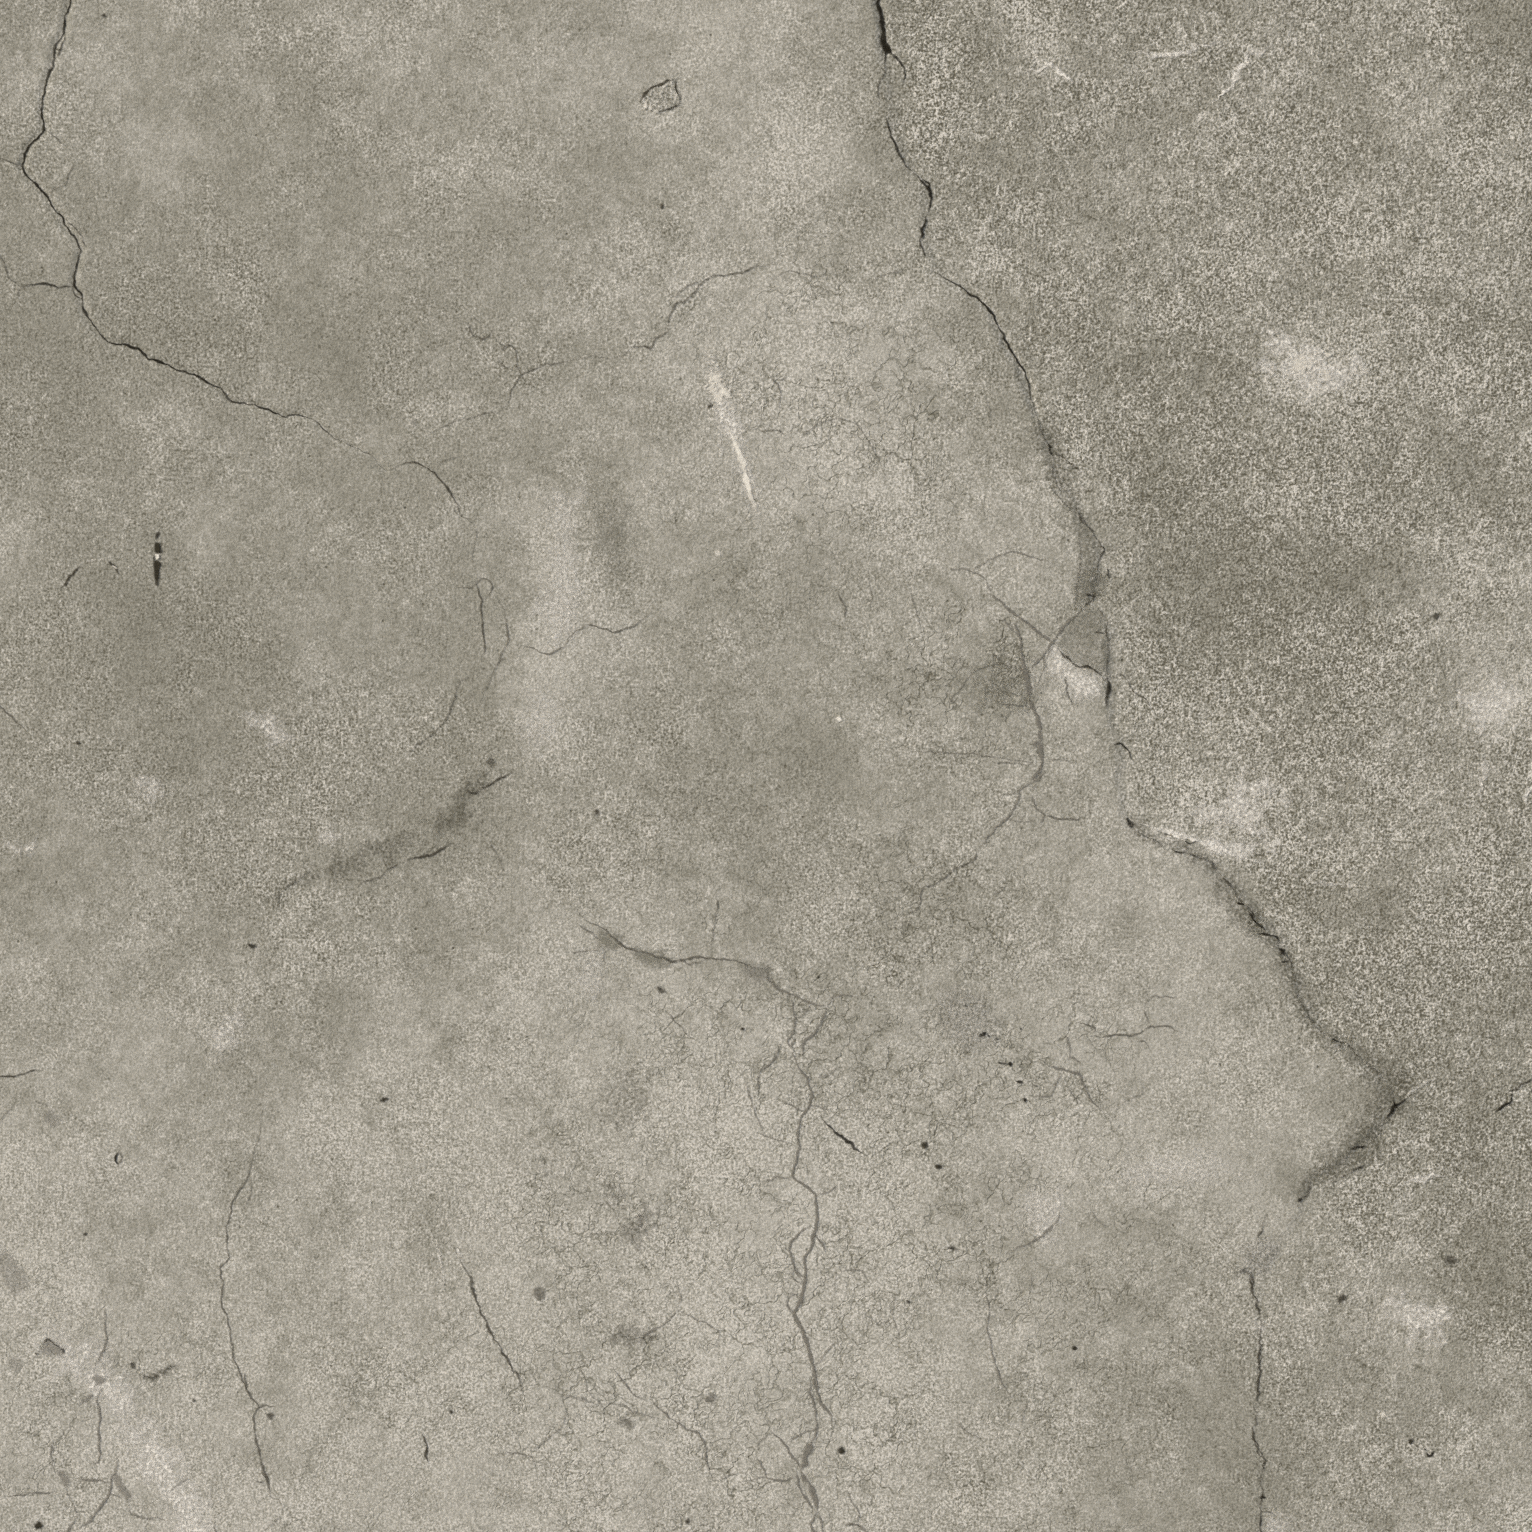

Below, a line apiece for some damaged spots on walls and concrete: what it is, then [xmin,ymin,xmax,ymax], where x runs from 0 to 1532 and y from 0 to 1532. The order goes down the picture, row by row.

crack [3,0,353,447]
crack [876,0,1033,403]
crack [401,461,459,511]
crack [909,515,1144,914]
crack [1126,818,1195,856]
crack [1226,882,1292,967]
crack [1040,1015,1170,1109]
crack [1351,1098,1407,1171]
crack [1494,1079,1531,1112]
crack [587,902,867,1532]
crack [1016,1218,1059,1248]
crack [1249,1223,1273,1532]